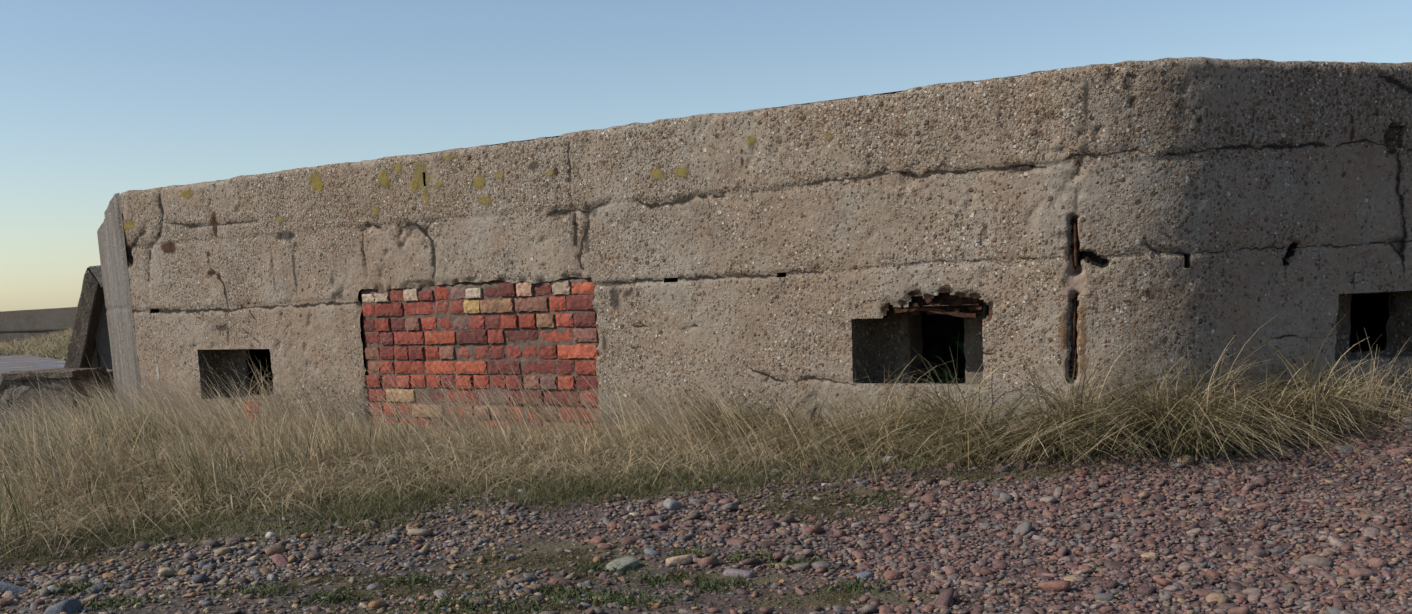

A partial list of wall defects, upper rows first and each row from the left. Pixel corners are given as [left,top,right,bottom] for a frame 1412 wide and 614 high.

crack [130,194,436,344]
crack [545,141,1060,285]
corrosion [1060,308,1085,368]
crack [787,138,1412,289]